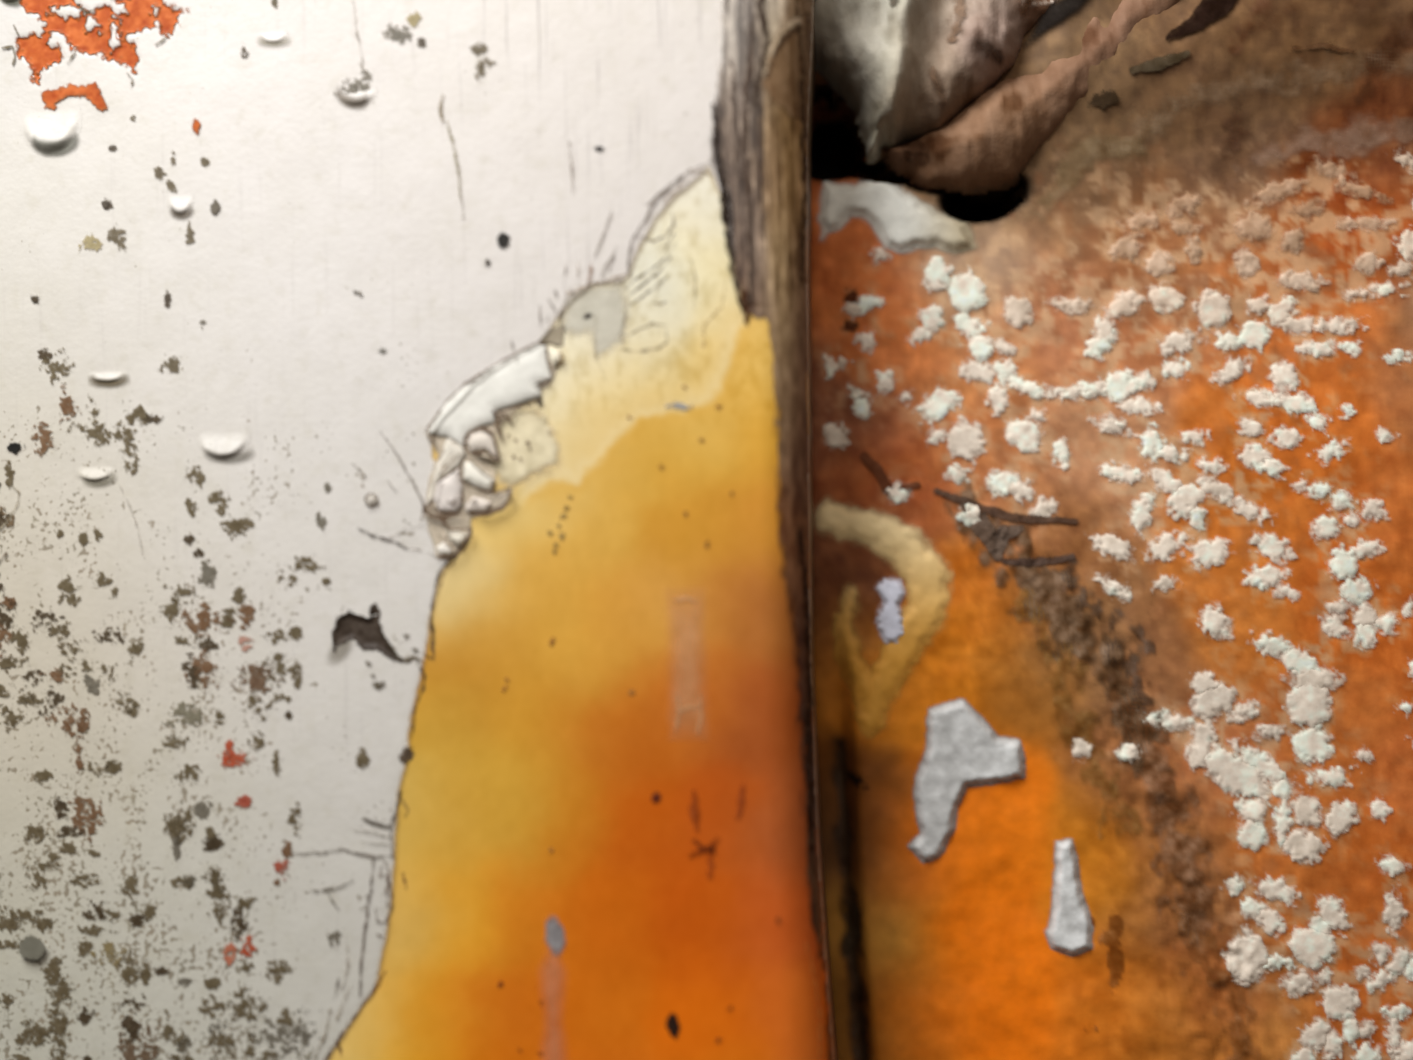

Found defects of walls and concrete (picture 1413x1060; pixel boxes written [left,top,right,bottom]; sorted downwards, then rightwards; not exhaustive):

peeling [1316,160,1389,201]
peeling [1395,153,1413,169]
peeling [807,179,1413,648]
peeling [0,167,829,1060]
spalling [908,699,1026,863]
water stain [958,516,1213,938]
spalling [1046,839,1093,956]
water stain [1091,915,1123,985]